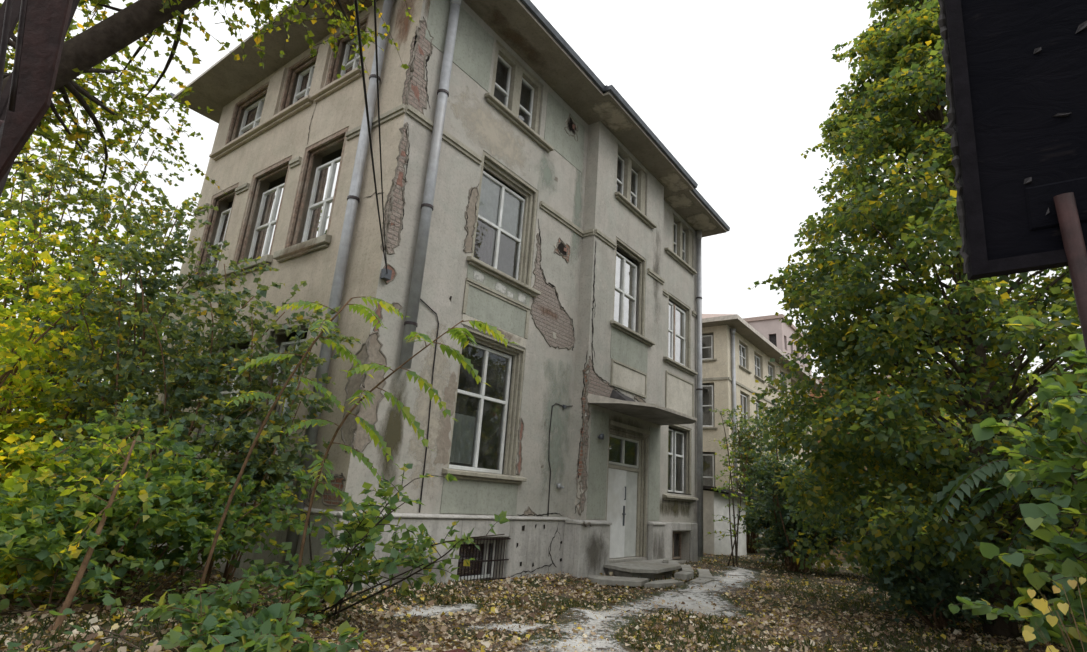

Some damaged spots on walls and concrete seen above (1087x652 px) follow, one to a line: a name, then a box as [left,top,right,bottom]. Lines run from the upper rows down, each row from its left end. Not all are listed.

peeling [402,17,434,115]
spalling [564,114,578,141]
peeling [380,122,410,285]
peeling [463,184,479,253]
peeling [473,219,576,351]
peeling [340,302,403,453]
peeling [316,472,346,507]
peeling [516,418,524,475]
flaking render [574,355,616,527]